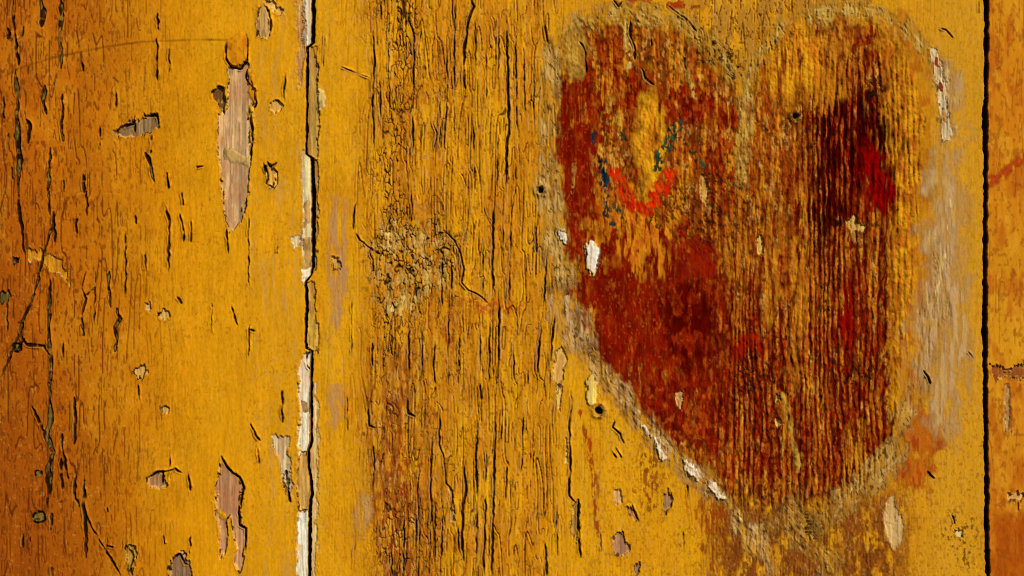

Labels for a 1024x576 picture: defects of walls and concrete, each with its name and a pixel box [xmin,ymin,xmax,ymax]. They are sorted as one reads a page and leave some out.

crack [3,0,192,576]
peeling [112,113,160,138]
peeling [211,62,259,234]
spalling [255,0,347,576]
crack [323,5,421,143]
crack [351,0,555,400]
peeling [905,47,974,435]
peeling [167,550,192,576]
peeling [214,459,246,574]
crack [347,410,376,485]
crack [391,400,534,574]
peeling [883,495,904,550]